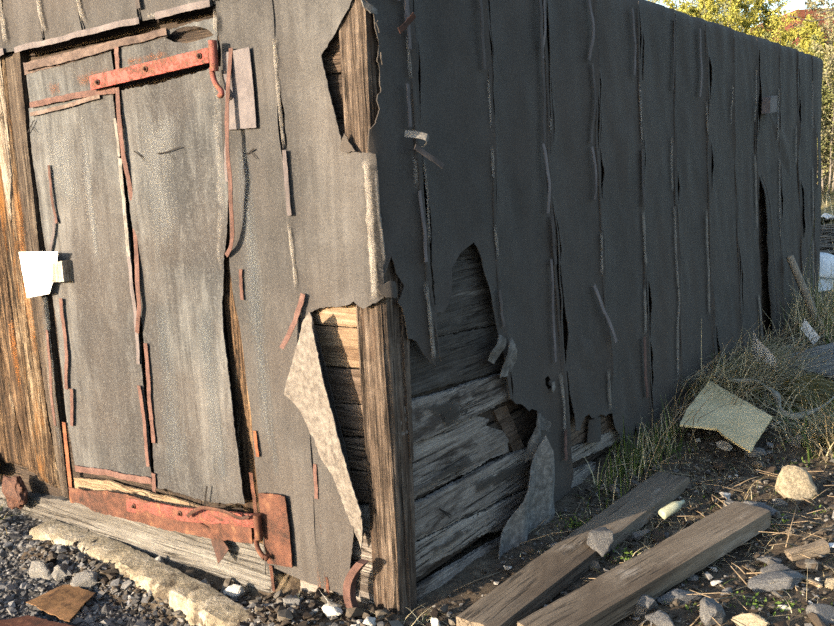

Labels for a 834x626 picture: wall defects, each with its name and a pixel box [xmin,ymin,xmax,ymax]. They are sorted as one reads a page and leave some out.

peeling [376,281,397,298]
peeling [488,334,517,378]
peeling [284,312,363,548]
peeling [499,412,555,559]